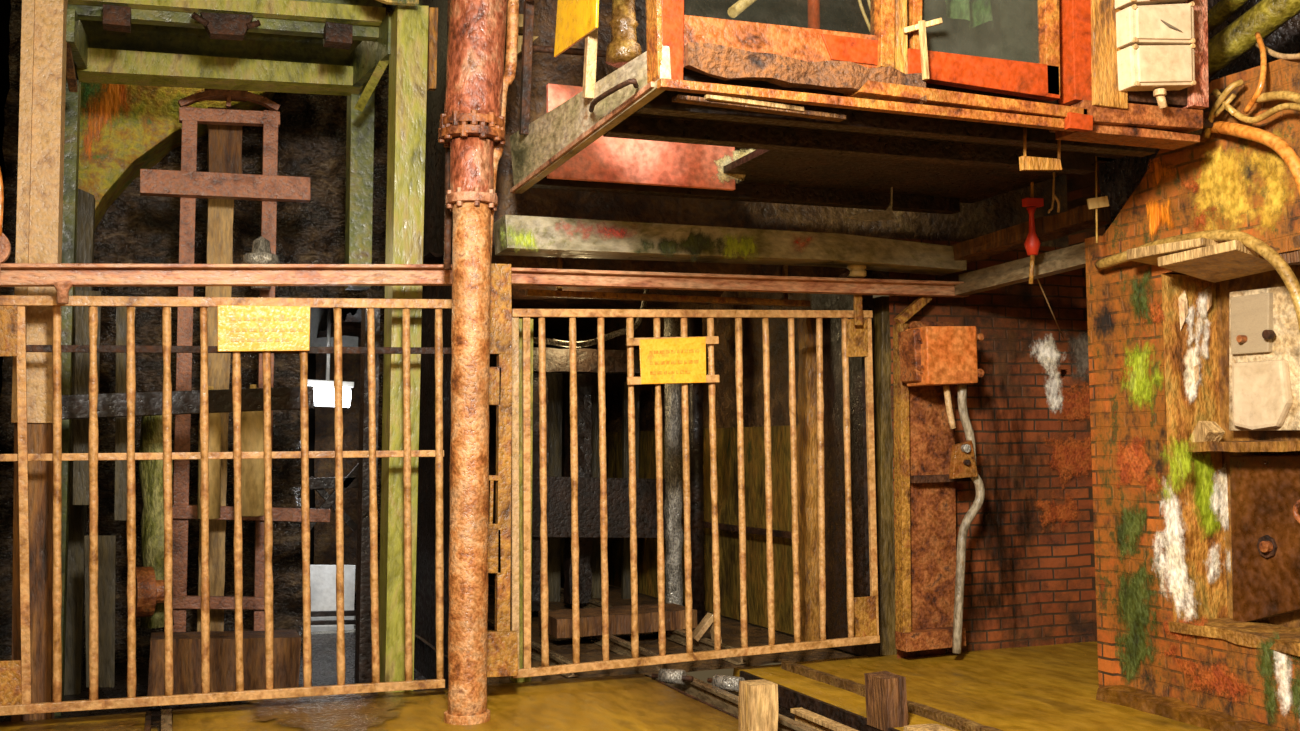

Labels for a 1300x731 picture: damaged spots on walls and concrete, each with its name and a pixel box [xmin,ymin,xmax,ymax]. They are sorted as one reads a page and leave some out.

leakage [1154,486,1194,617]
leakage [1190,452,1231,582]
leakage [1257,634,1300,727]